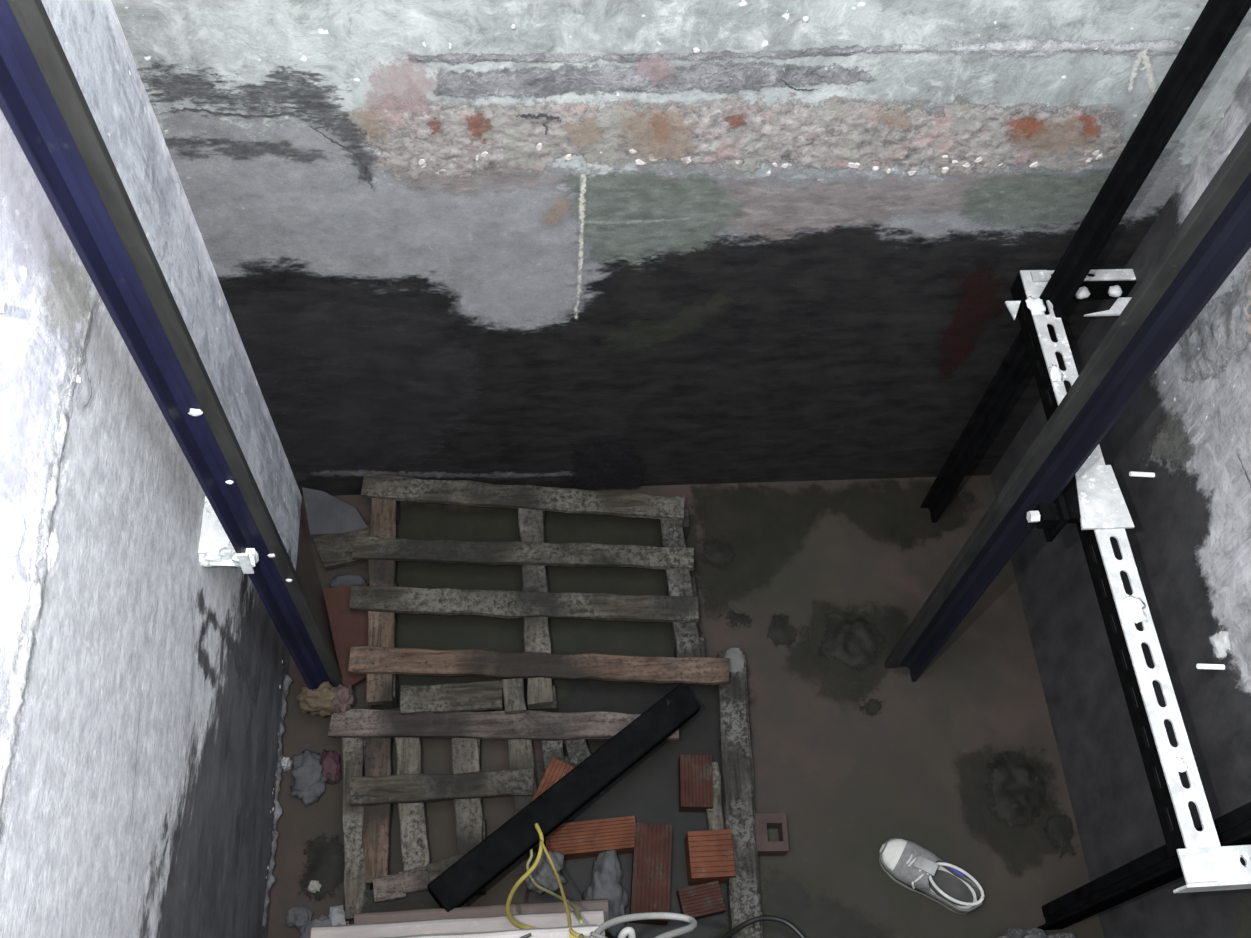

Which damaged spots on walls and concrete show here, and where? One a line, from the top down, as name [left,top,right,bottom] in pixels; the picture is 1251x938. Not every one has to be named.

spalling [343,89,1128,182]
water stain [163,90,1118,497]
water stain [1050,141,1191,393]